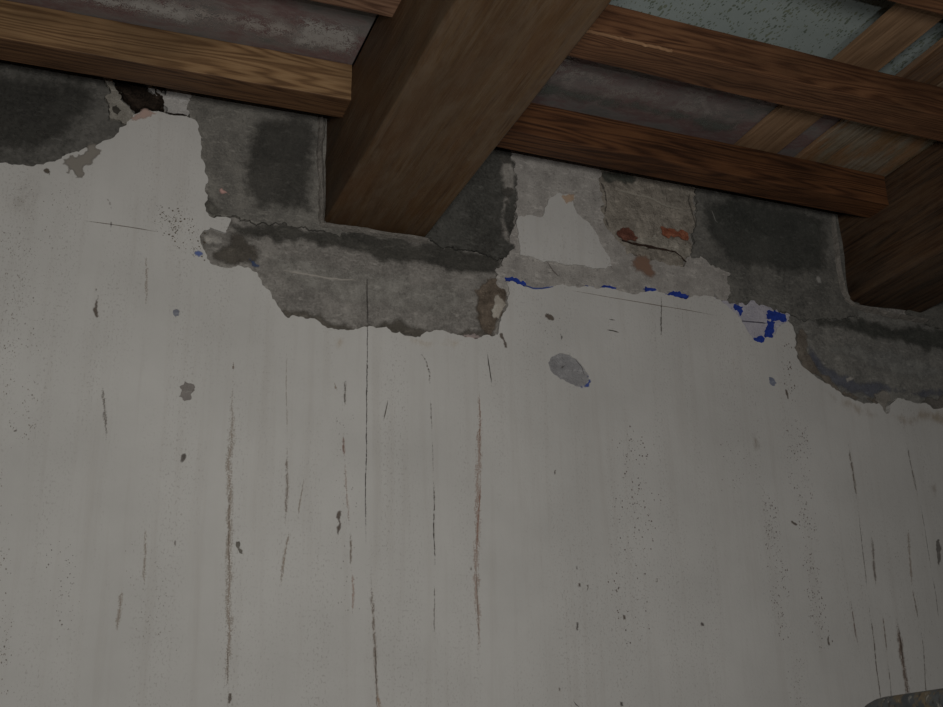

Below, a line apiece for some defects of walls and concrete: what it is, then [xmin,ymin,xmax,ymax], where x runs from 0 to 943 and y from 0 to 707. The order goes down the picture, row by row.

spalling [0,60,192,178]
spalling [200,150,943,413]